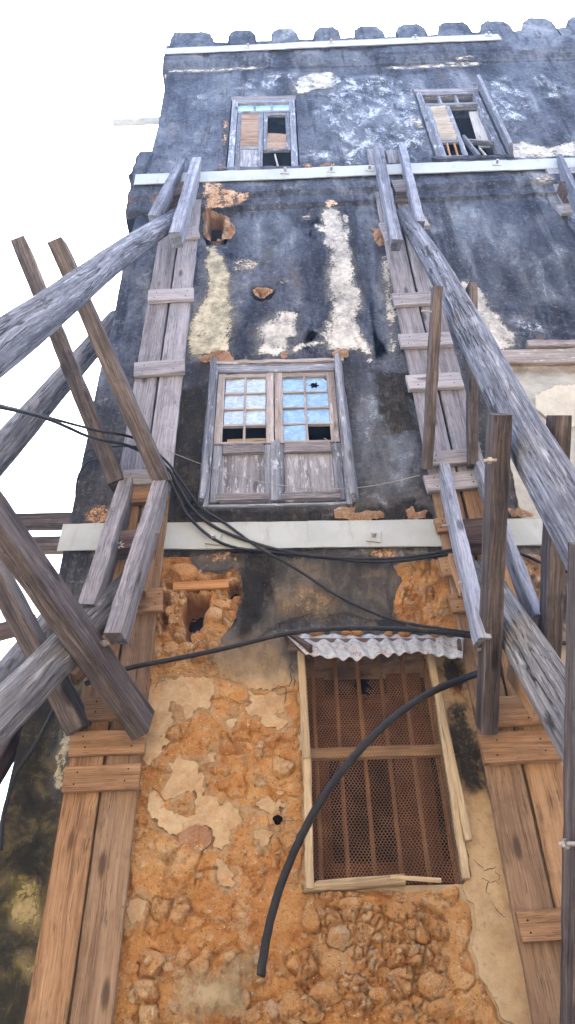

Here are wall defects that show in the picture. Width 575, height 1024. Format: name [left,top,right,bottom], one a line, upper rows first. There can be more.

peeling [187,162,258,363]
peeling [253,199,373,363]
peeling [533,384,575,428]
damp [441,659,463,690]
spalling [113,547,532,1024]
damp [448,703,490,796]
crack [473,859,506,917]